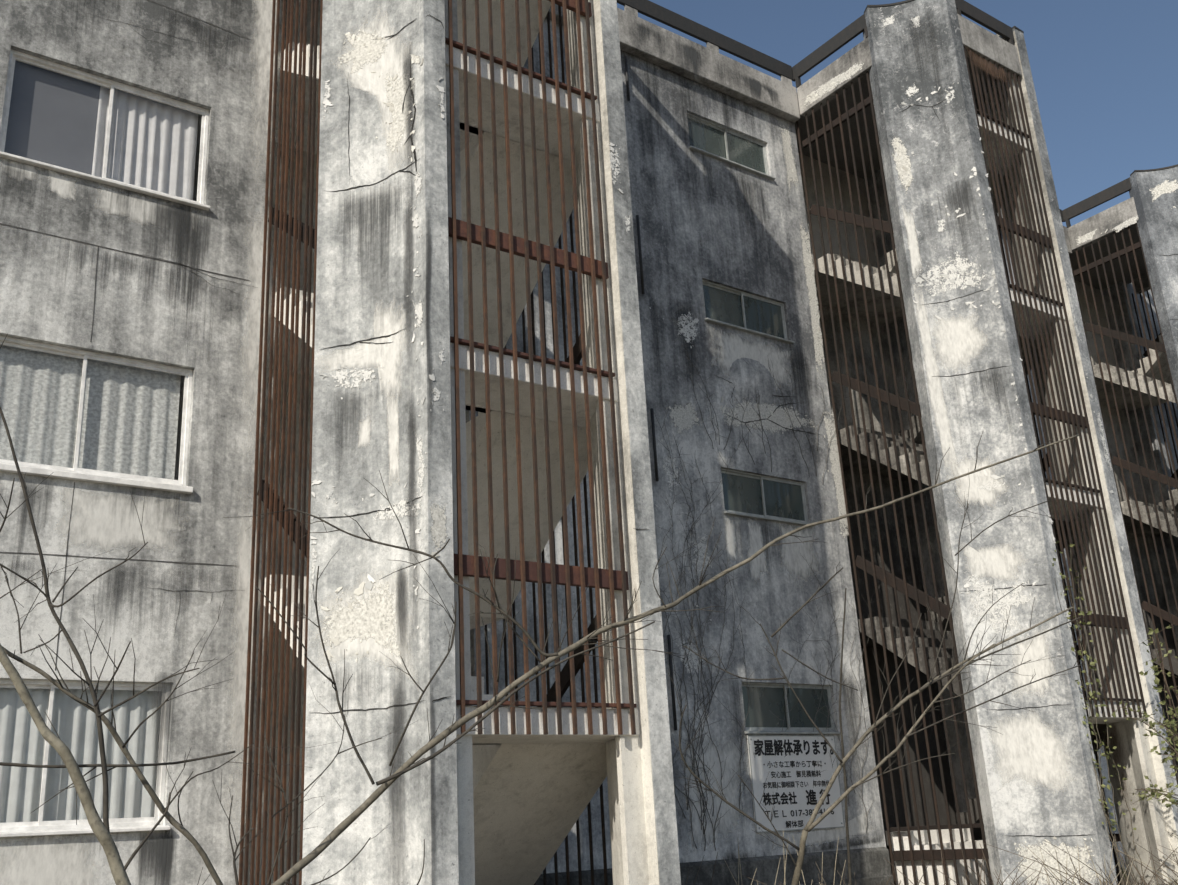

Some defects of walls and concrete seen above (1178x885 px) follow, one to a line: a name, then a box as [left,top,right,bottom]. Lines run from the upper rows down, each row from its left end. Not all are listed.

crack [371,14,444,40]
damp [3,159,76,199]
damp [99,186,209,286]
crack [330,66,419,192]
peeling [338,29,423,237]
peeling [901,83,959,106]
peeling [913,167,1001,320]
spalling [1149,180,1178,209]
crack [319,328,406,350]
peeling [406,251,445,417]
damp [321,572,410,677]
damp [391,688,404,816]